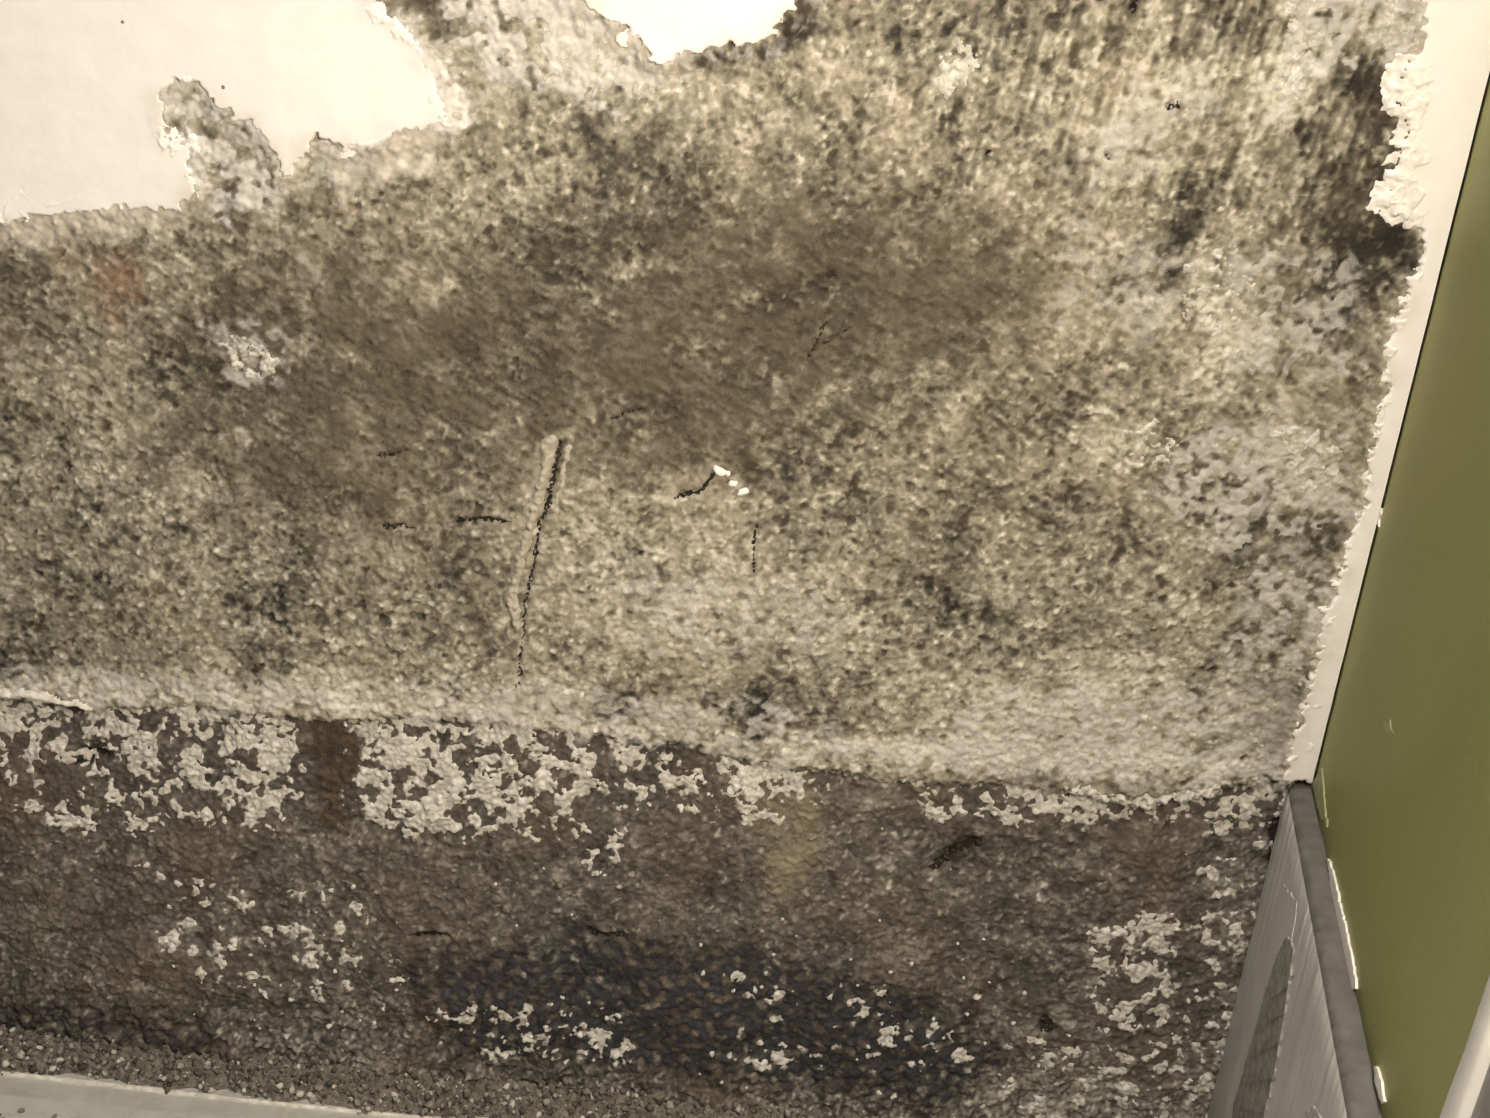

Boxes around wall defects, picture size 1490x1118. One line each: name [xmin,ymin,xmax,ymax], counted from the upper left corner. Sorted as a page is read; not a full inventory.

leakage [190,318,354,507]
crack [376,449,408,458]
crack [382,522,415,531]
leakage [314,269,548,518]
crack [456,434,572,688]
peeling [0,0,1435,801]
leakage [528,211,996,459]
leakage [300,719,360,835]
spalling [0,688,1306,1118]
leakage [750,791,818,895]
leakage [0,1003,206,1053]
leakage [410,926,1001,1104]